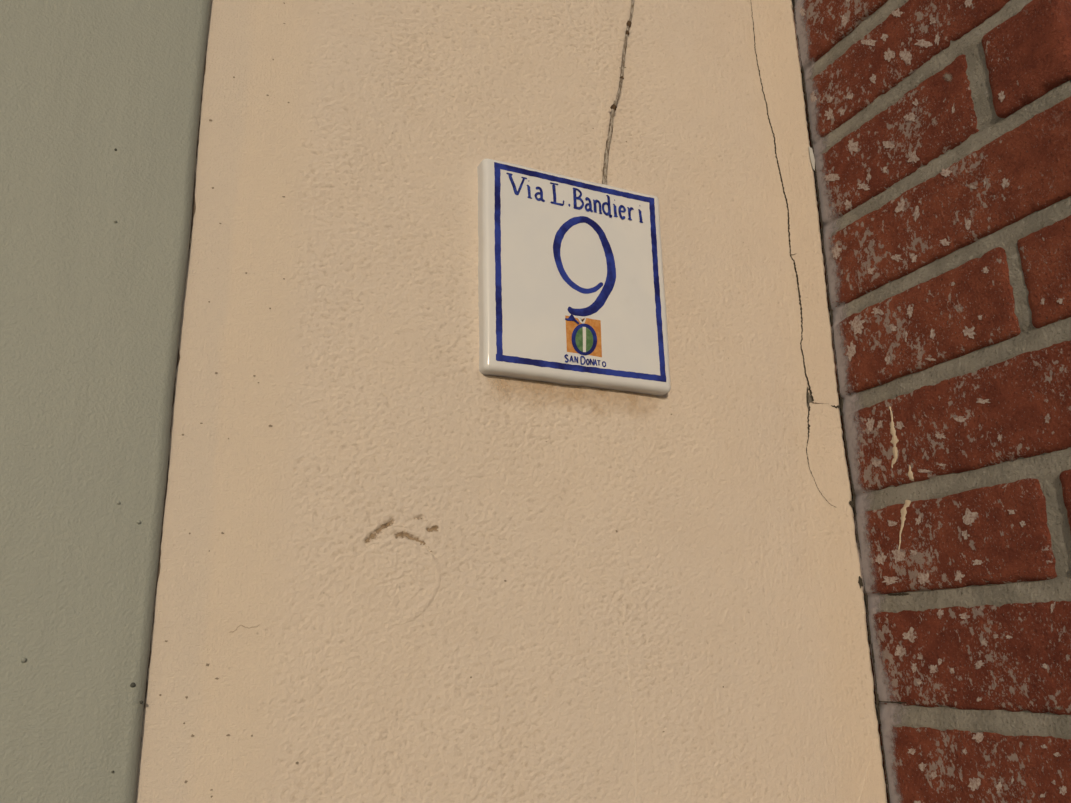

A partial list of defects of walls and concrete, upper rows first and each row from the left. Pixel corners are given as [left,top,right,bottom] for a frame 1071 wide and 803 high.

crack [751,0,909,803]
water stain [889,406,899,468]
flaking render [365,518,438,554]